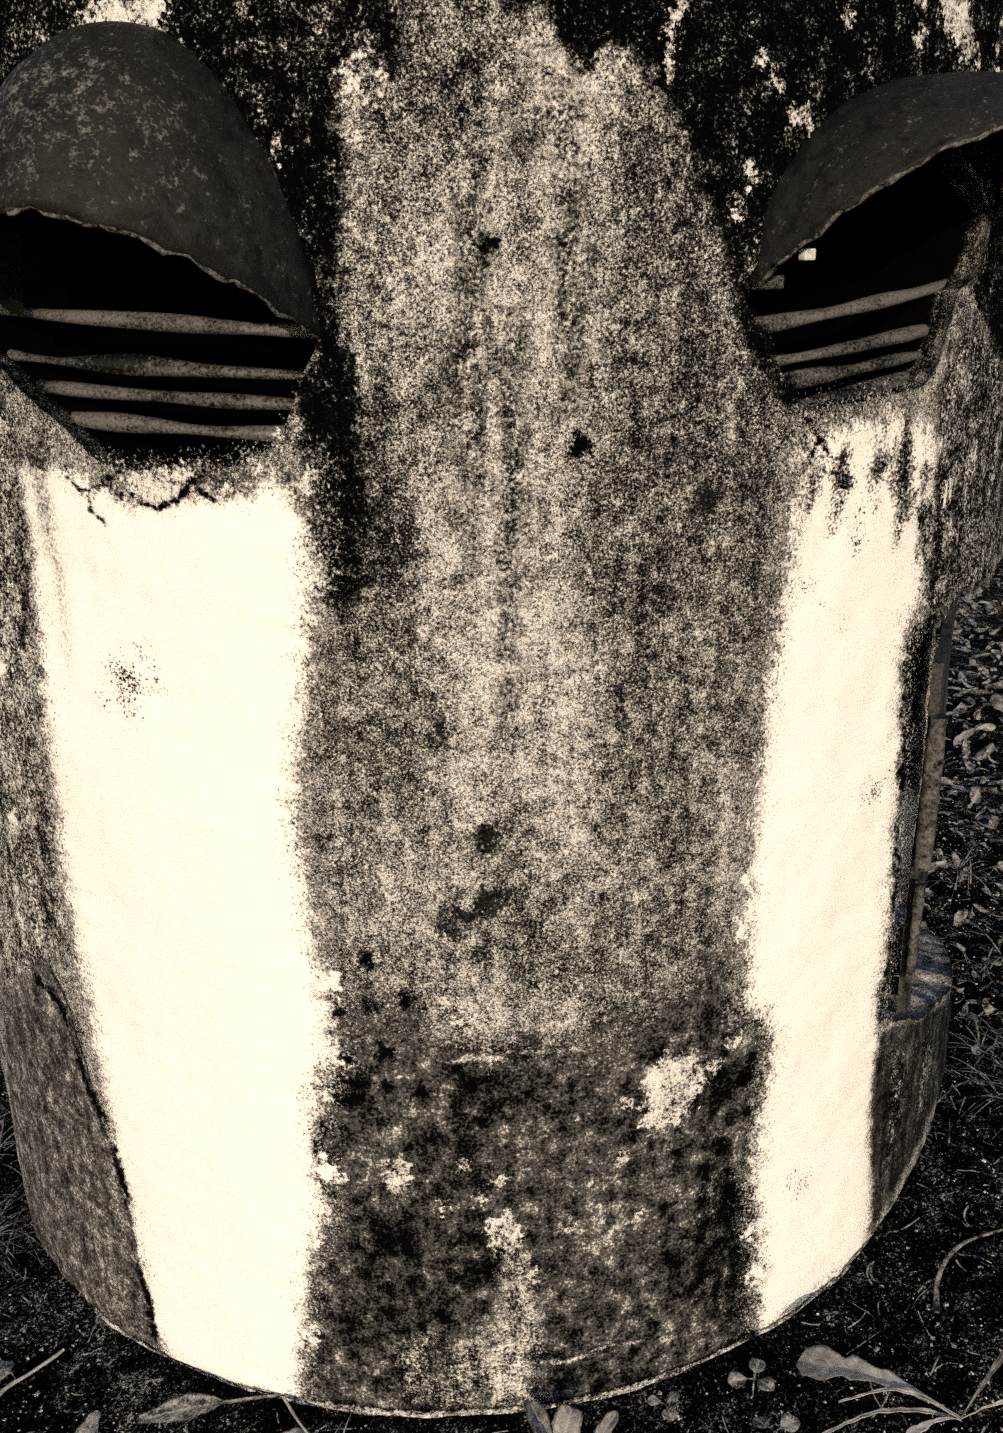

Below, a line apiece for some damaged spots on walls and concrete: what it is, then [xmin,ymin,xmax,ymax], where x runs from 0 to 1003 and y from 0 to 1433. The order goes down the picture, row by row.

leakage [0,0,108,86]
leakage [129,0,409,624]
leakage [436,0,1003,739]
leakage [423,715,459,750]
leakage [94,925,850,1418]